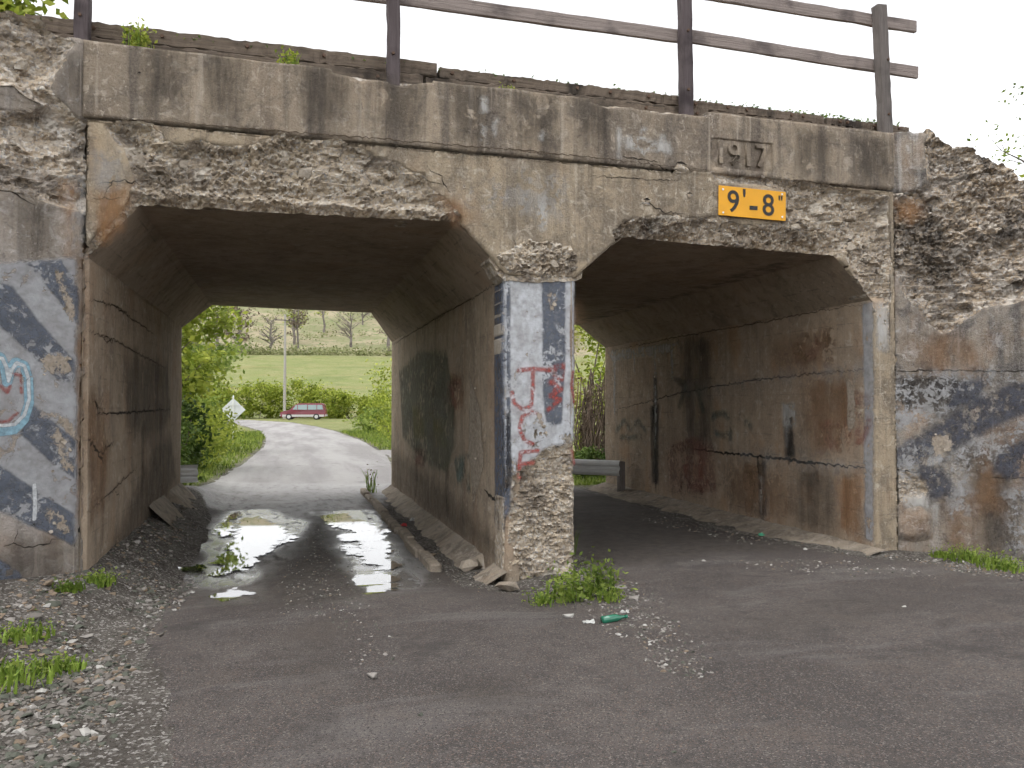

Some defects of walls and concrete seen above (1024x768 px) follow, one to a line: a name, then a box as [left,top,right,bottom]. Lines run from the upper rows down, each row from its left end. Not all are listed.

spalling [0,11,87,216]
spalling [84,118,462,257]
crack [94,118,706,214]
spalling [612,129,1024,343]
crack [67,401,171,513]
crack [86,299,165,370]
spalling [495,412,574,581]
crack [617,368,864,410]
crack [692,448,864,489]
leakage [783,405,795,457]